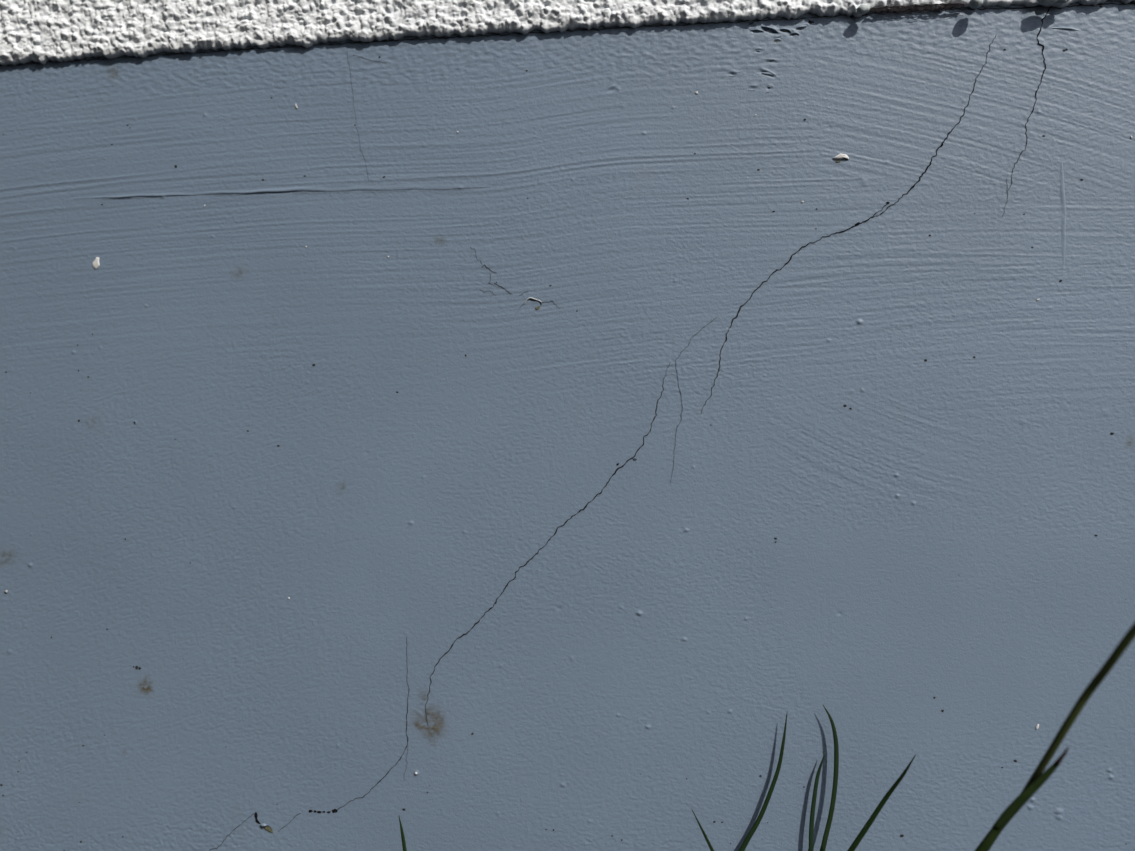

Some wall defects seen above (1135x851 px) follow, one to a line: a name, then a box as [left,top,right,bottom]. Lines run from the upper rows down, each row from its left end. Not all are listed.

crack [277,36,996,832]
crack [1002,8,1050,217]